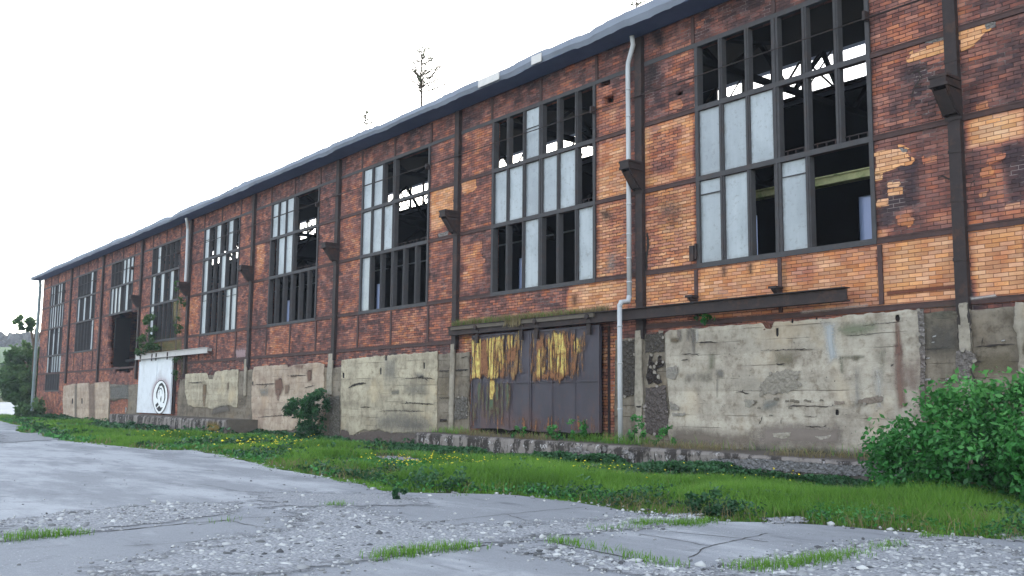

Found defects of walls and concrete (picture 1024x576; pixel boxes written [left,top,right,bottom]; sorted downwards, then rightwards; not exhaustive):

peeling [906,37,944,63]
peeling [959,21,996,52]
peeling [874,145,937,227]
spalling [622,331,668,436]